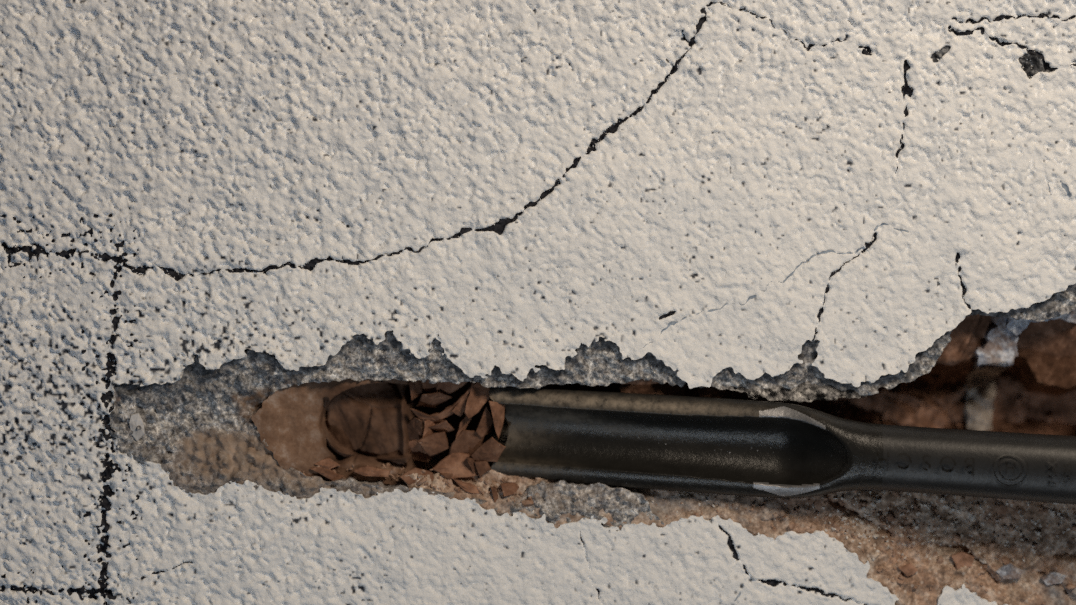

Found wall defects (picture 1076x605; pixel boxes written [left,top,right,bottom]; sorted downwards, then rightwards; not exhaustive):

crack [739,8,872,55]
crack [895,13,1076,174]
crack [0,2,726,605]
crack [643,223,909,348]
crack [937,253,971,309]
spalling [109,283,1076,605]
crack [719,525,867,605]